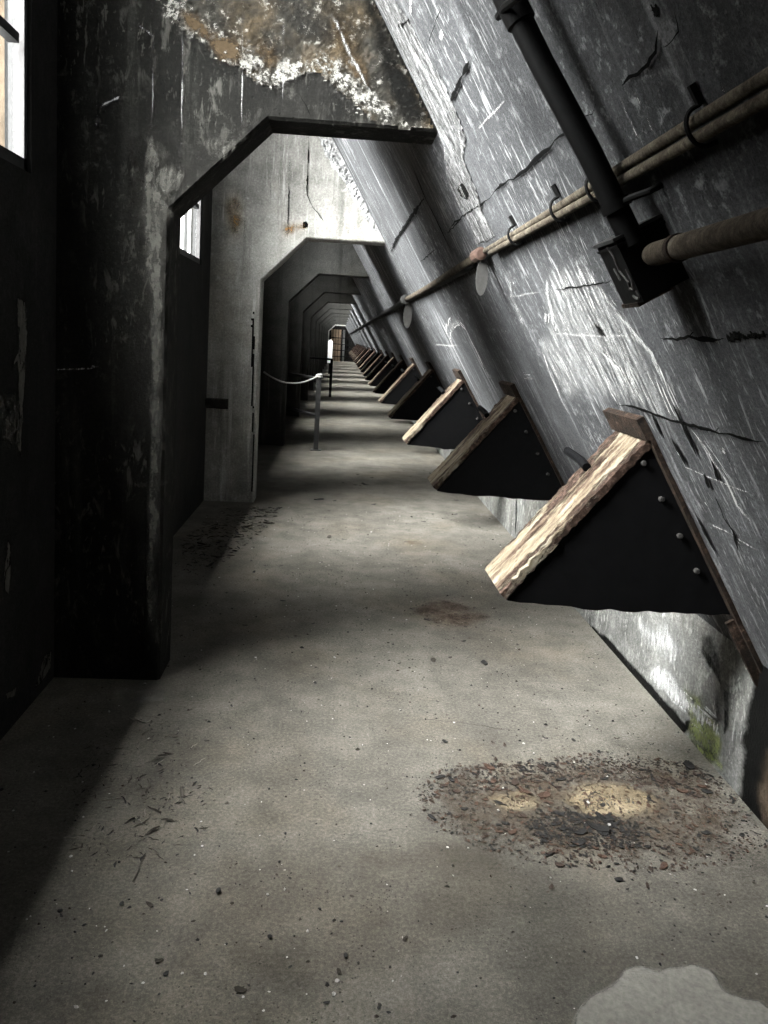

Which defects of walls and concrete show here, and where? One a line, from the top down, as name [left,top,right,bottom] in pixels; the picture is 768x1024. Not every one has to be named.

damp [156,0,227,43]
peeling [160,0,433,130]
damp [214,0,495,245]
crack [450,61,469,102]
crack [622,13,679,85]
crack [391,199,424,251]
crack [421,133,565,261]
crack [661,332,724,342]
crack [619,405,768,553]
damp [592,624,768,829]